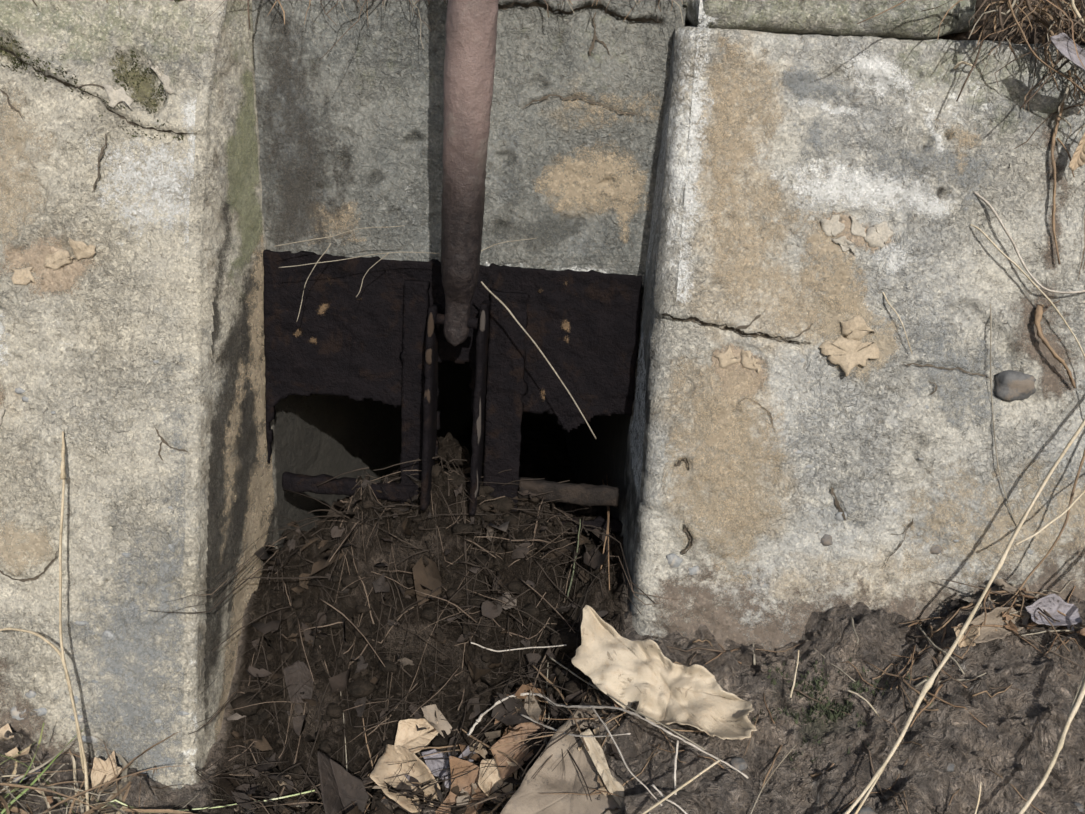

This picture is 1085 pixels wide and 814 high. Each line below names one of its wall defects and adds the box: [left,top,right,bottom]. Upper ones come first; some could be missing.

crack [498,2,663,57]
crack [0,48,193,191]
damp [256,3,350,252]
rust [425,312,434,365]
crack [662,313,813,344]
crack [903,363,994,395]
damp [203,203,275,729]